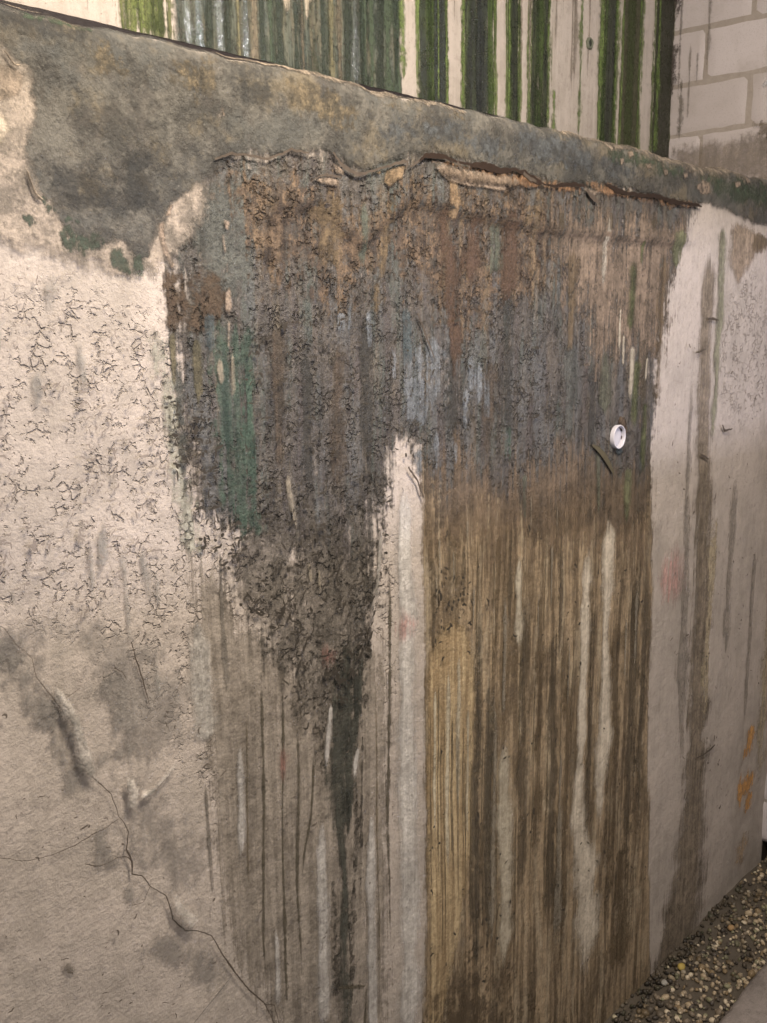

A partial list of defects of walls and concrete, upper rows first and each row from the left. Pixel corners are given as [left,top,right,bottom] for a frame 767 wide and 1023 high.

damp [175,0,402,93]
damp [418,0,435,102]
damp [465,0,478,111]
damp [476,0,497,115]
damp [508,0,523,121]
damp [620,0,644,148]
damp [0,41,138,277]
spalling [437,164,509,190]
crack [0,626,80,710]
crack [114,642,149,703]
damp [654,261,717,970]
crack [3,776,279,1023]